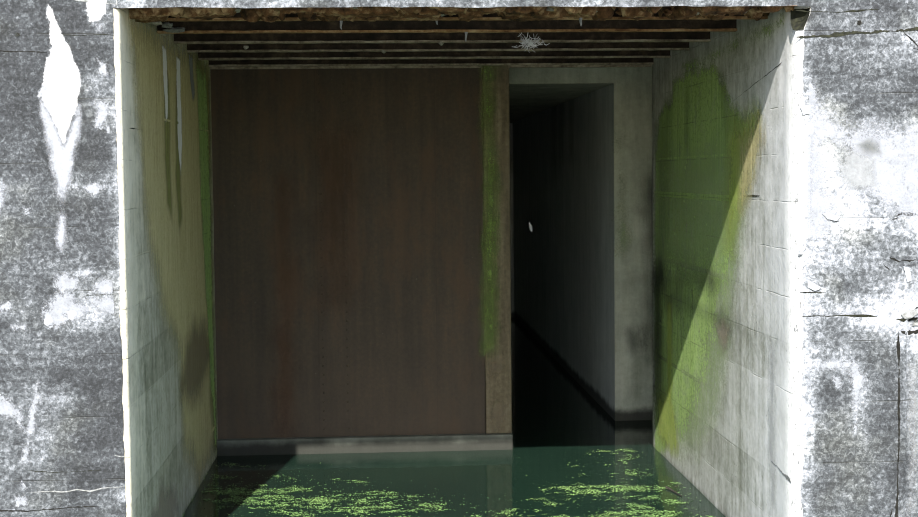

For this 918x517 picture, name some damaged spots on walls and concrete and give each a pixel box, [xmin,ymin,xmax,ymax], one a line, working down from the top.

crack [796,9,918,50]
water stain [729,116,754,232]
flaking render [798,82,918,256]
spalling [884,257,918,335]
crack [890,332,900,517]